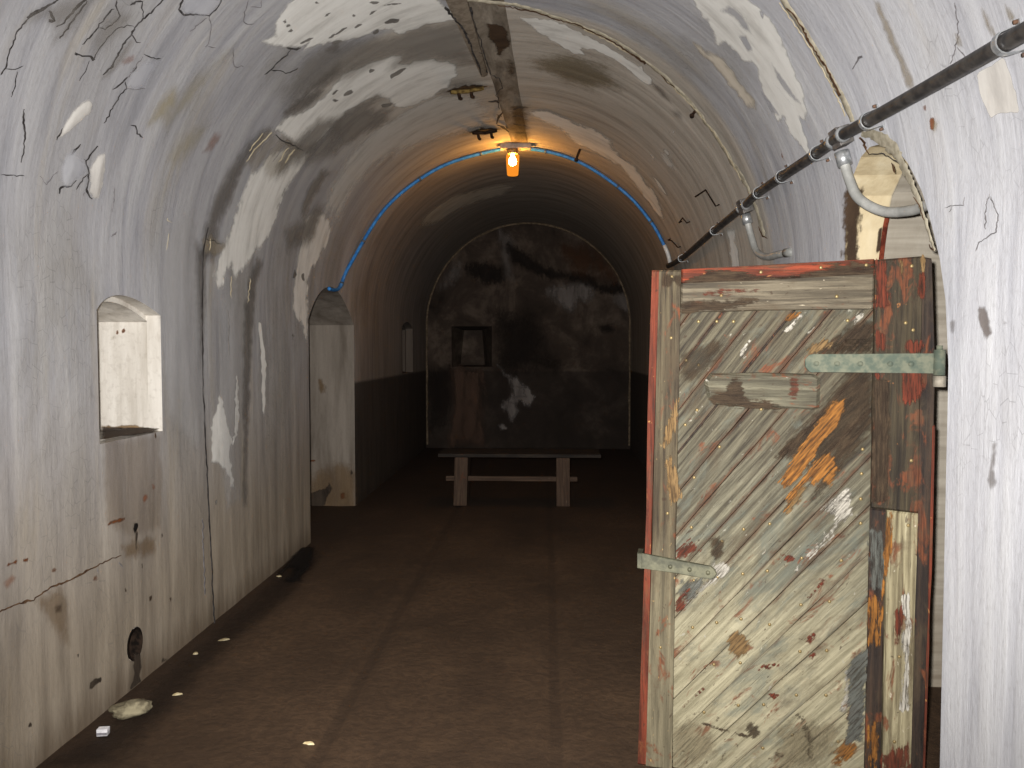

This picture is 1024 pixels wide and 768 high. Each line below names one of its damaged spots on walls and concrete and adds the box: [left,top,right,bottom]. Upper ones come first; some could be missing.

peeling [263,0,454,50]
peeling [694,0,809,154]
peeling [977,58,1019,117]
peeling [57,101,92,139]
crack [1,0,308,237]
peeling [90,154,105,198]
peeling [206,56,498,340]
flaking render [861,130,935,273]
crack [946,194,999,251]
damp [506,243,623,294]
peeling [211,376,240,487]
crack [0,555,123,612]